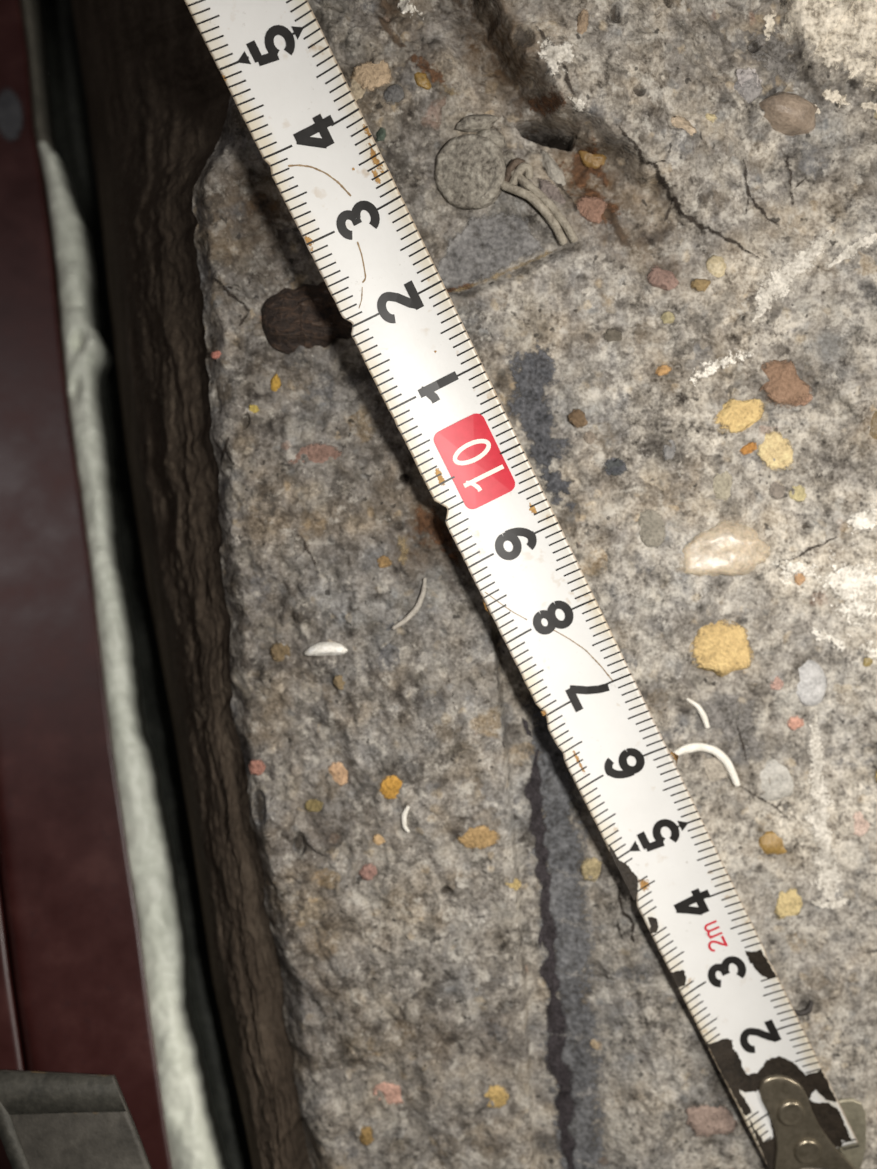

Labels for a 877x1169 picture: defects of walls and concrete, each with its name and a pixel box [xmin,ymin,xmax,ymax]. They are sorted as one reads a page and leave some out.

crack [538,27,575,95]
crack [619,127,760,258]
crack [743,159,805,226]
crack [522,718,577,1169]